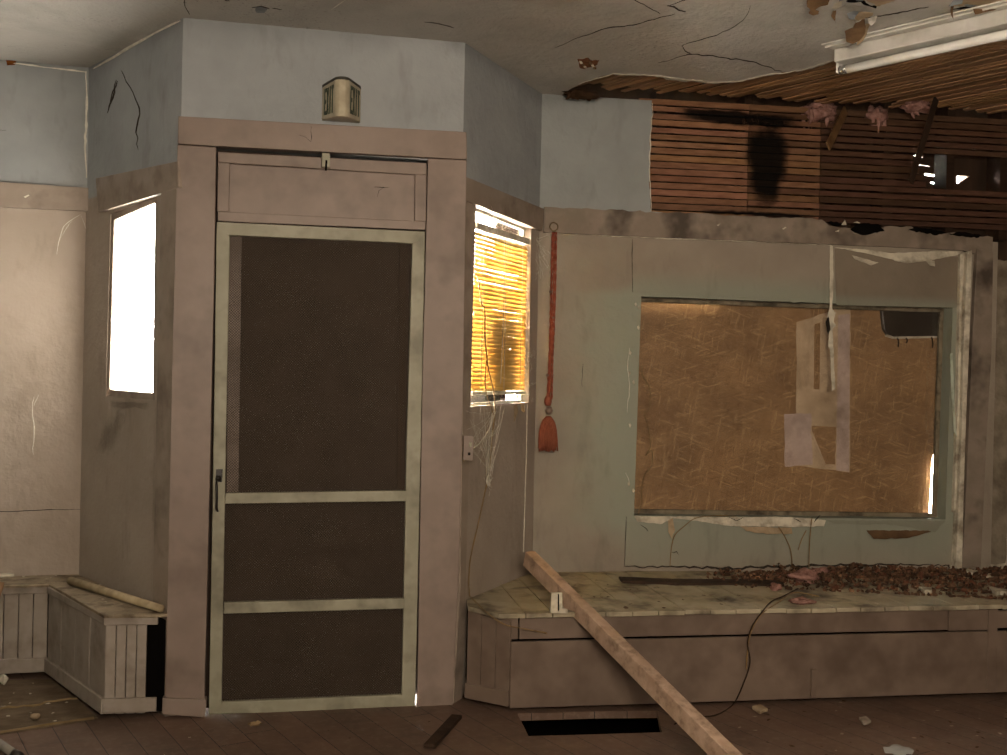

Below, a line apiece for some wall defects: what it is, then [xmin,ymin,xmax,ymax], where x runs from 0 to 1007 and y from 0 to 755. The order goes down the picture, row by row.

spalling [577,58,599,69]
crack [555,0,686,48]
crack [659,8,780,71]
peeling [807,0,928,45]
flaking render [949,0,1001,18]
damp [684,108,813,218]